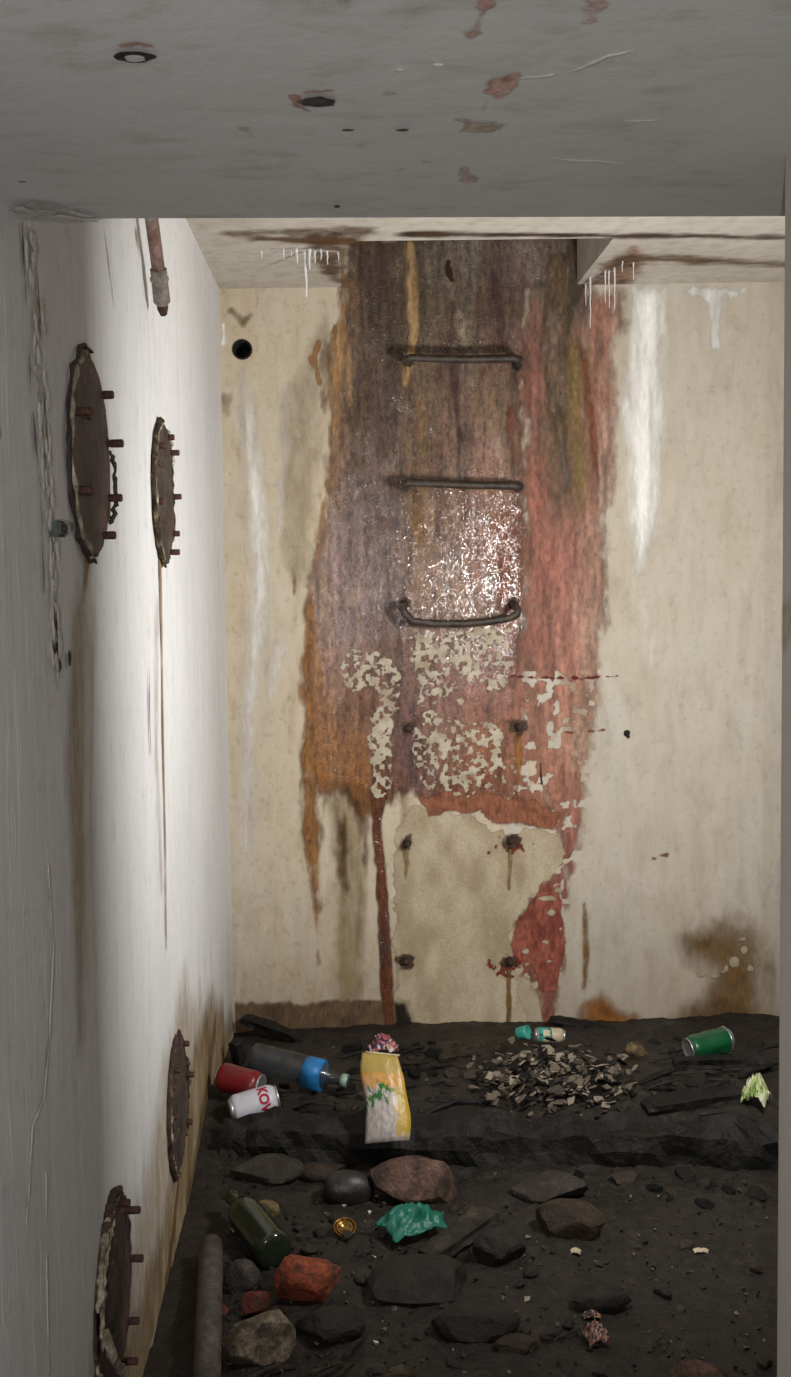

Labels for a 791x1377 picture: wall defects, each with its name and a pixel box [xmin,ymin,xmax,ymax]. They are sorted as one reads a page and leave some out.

rust [227,228,371,283]
peeling [445,260,454,282]
leakage [686,286,746,349]
leakage [623,288,665,562]
rust [399,232,785,1022]
peeling [340,625,566,1024]
rust [395,954,414,969]
leakage [683,925,757,1018]
rust [124,999,232,1377]